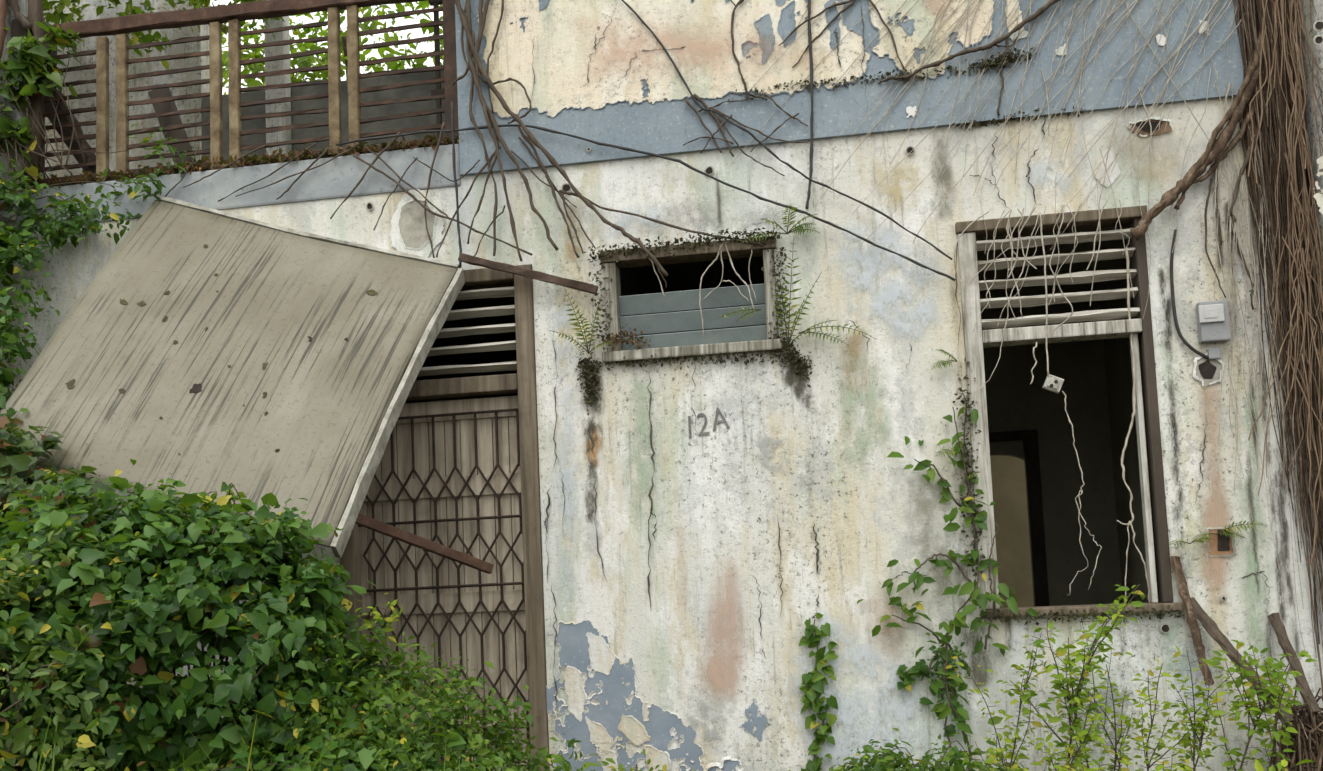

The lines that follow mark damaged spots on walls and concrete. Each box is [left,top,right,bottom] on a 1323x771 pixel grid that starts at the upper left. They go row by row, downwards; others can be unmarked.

peeling [476,0,1028,119]
crack [969,117,1046,207]
spalling [1127,117,1173,137]
peeling [1313,156,1323,215]
water stain [783,355,811,408]
crack [544,328,607,715]
rust [587,431,599,465]
crack [647,368,657,608]
peeling [546,620,744,771]
peeling [741,698,768,741]